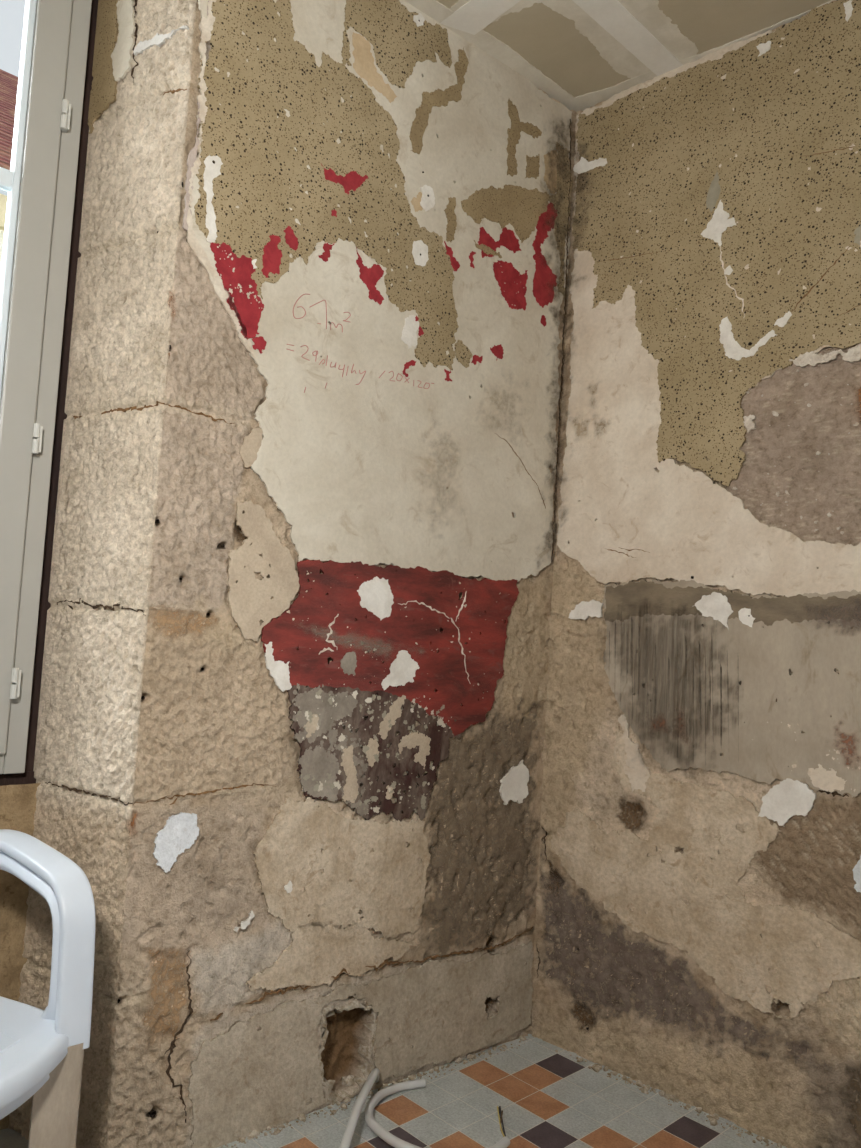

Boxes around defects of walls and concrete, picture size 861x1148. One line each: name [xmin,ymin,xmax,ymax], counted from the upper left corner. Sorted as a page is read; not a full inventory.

peeling [88,0,136,134]
crack [72,401,234,424]
crack [57,598,146,616]
crack [398,591,470,683]
peeling [182,0,861,1148]
water stain [609,605,722,764]
crack [45,782,276,806]
crack [164,927,541,1123]